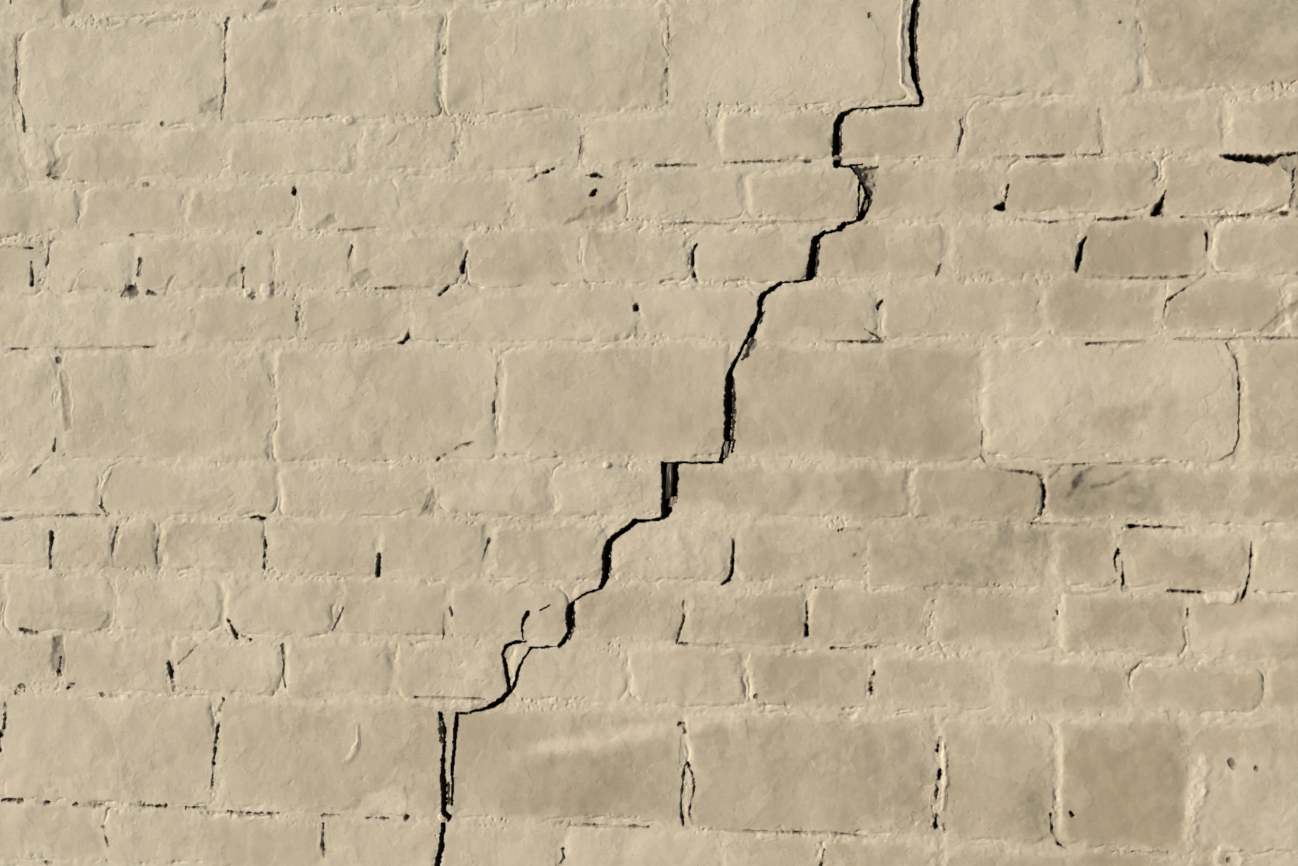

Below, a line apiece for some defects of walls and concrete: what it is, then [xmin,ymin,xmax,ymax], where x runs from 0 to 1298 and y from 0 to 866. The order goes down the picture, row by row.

crack [338,227,433,290]
crack [414,0,925,866]
crack [331,606,345,631]
crack [320,813,410,822]